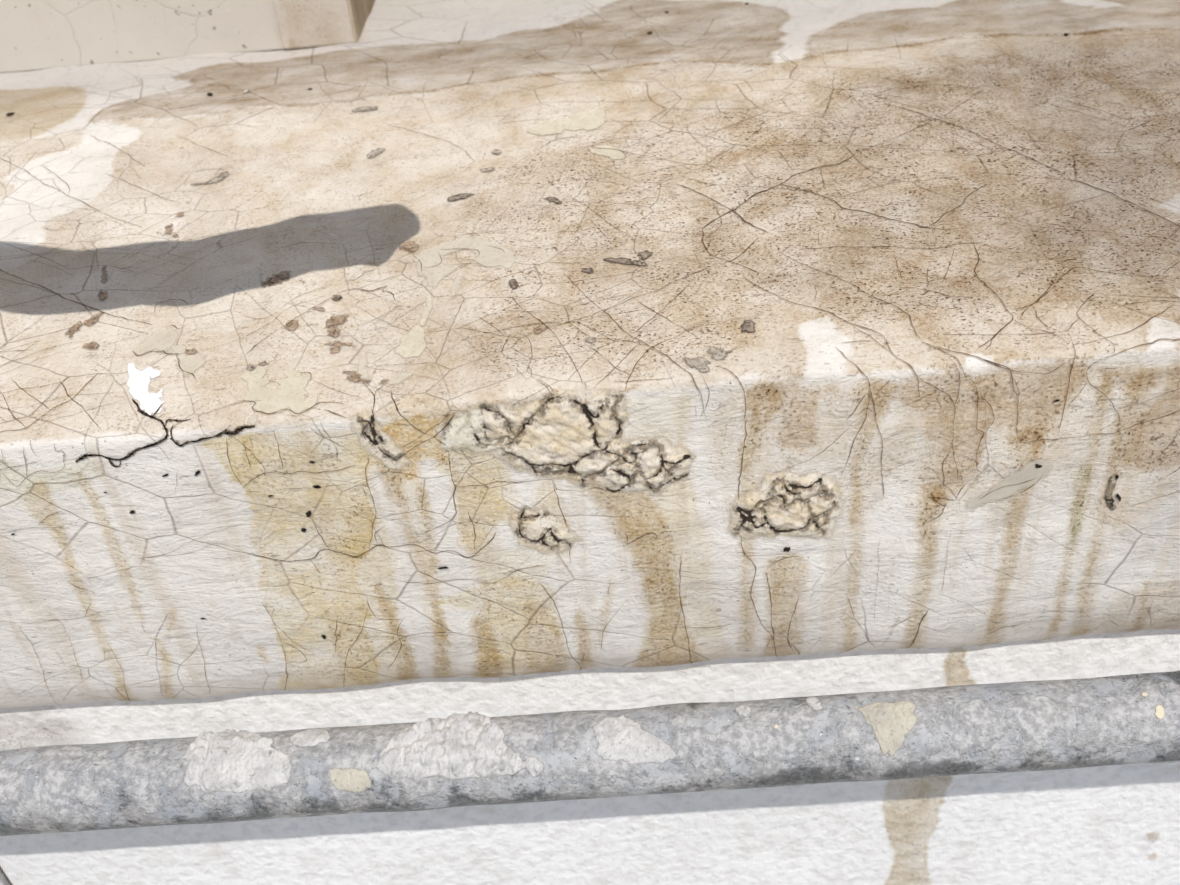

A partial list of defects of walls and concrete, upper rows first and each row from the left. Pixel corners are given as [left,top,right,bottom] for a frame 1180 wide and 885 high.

crack [0,158,150,272]
crack [494,84,1180,543]
crack [0,227,524,584]
peeling [967,460,1052,508]
crack [6,582,168,695]
crack [284,602,403,691]
crack [501,484,617,668]
crack [679,565,729,664]
crack [741,531,799,653]
crack [846,542,945,648]